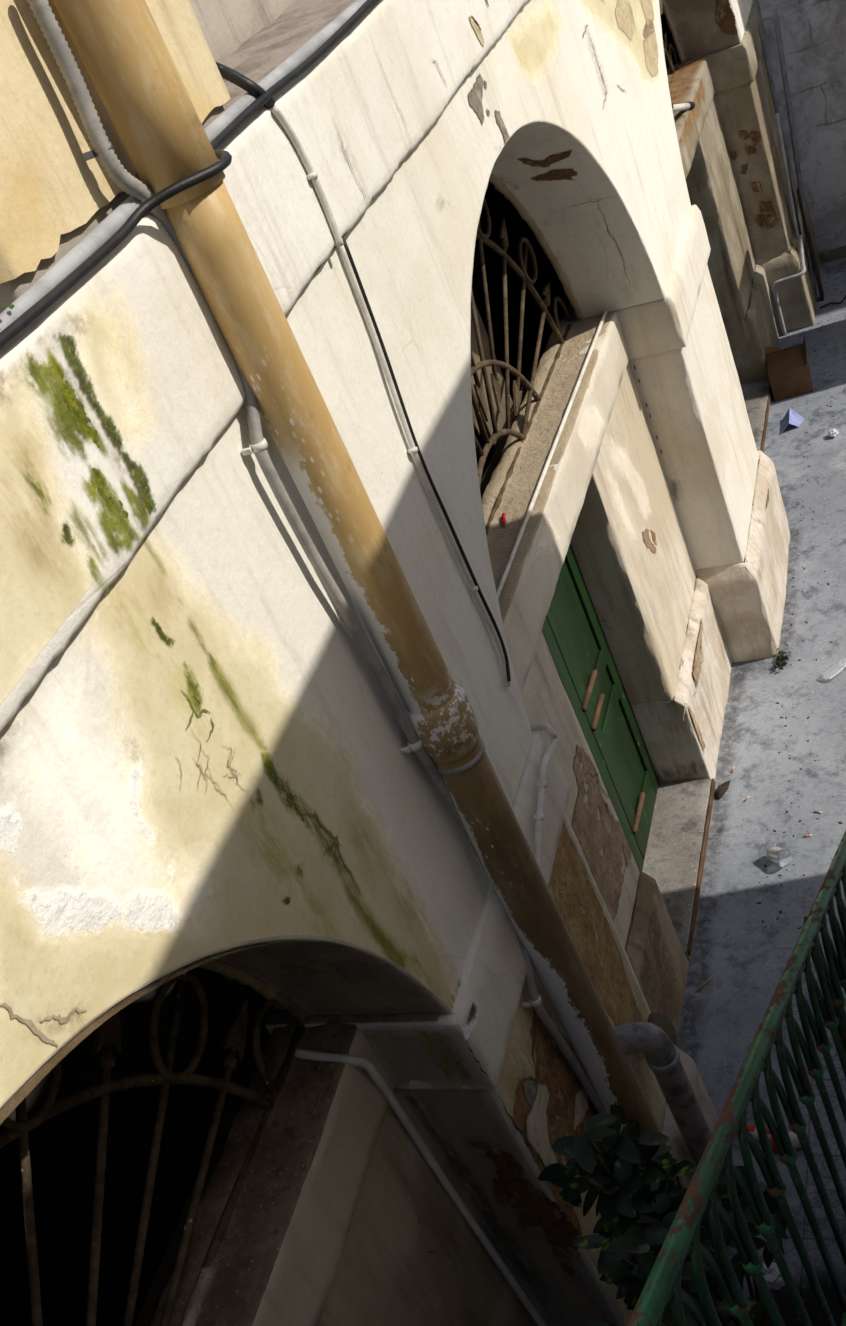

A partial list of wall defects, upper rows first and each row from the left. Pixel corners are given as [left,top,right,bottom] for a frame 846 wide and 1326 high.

peeling [602,0,740,77]
peeling [468,75,509,143]
peeling [518,150,577,181]
crack [176,732,247,802]
damp [0,544,455,1104]
crack [0,1002,87,1047]
damp [373,1031,475,1085]
peeling [460,970,610,1267]